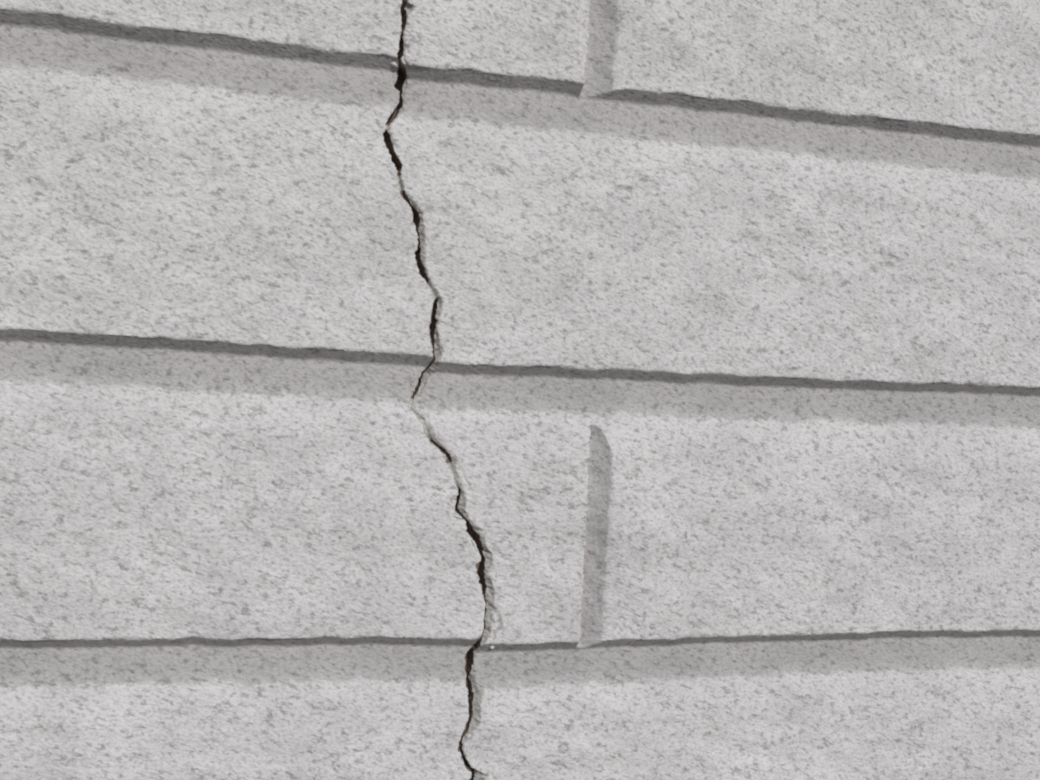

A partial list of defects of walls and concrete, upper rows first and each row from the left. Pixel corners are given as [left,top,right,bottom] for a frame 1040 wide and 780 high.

crack [383,0,513,780]